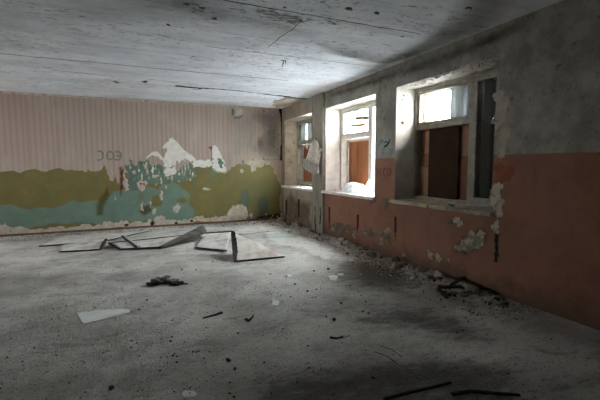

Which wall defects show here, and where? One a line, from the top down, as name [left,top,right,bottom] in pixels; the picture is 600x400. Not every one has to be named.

crack [207,0,419,66]
peeling [491,90,511,160]
peeling [0,153,281,235]
peeling [454,182,505,253]